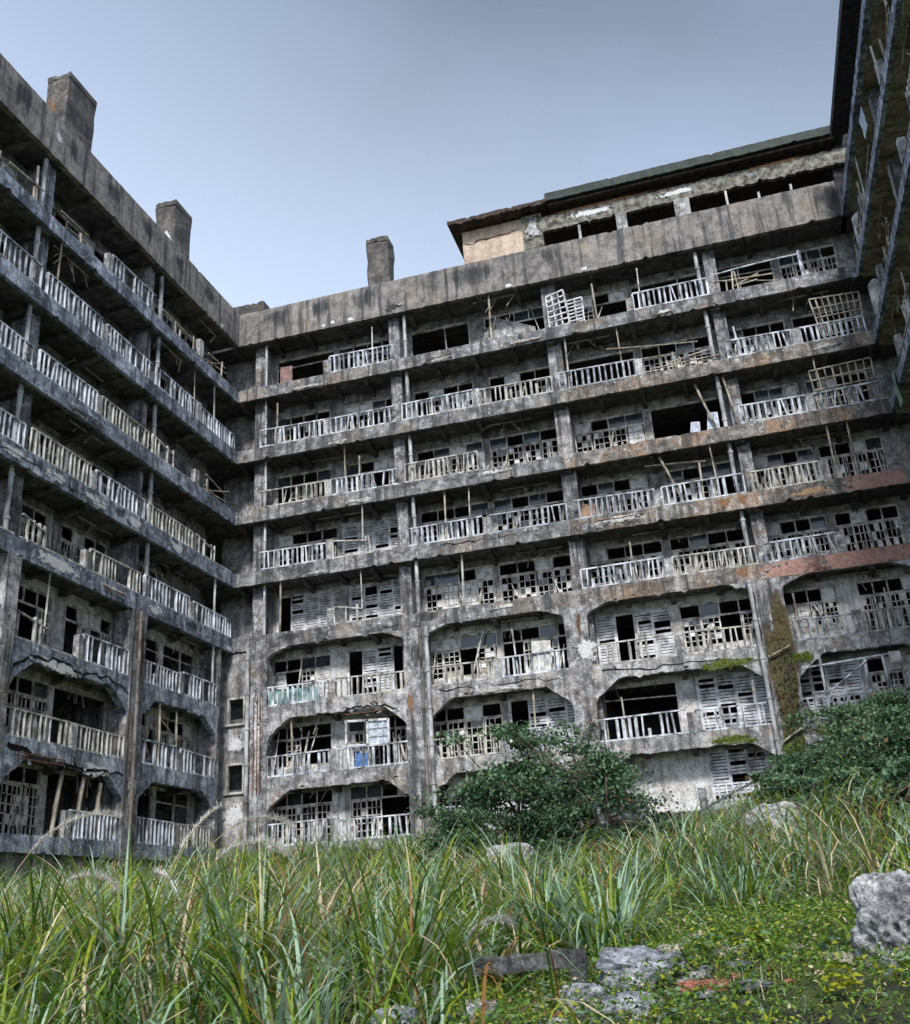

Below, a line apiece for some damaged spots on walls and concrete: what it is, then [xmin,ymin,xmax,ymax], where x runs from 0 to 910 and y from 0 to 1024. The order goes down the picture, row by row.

damp [17,84,30,112]
damp [814,184,843,212]
damp [445,267,489,287]
damp [354,292,375,308]
damp [313,302,335,327]
crack [12,655,128,693]
spalling [18,752,66,769]
peeling [79,762,110,778]